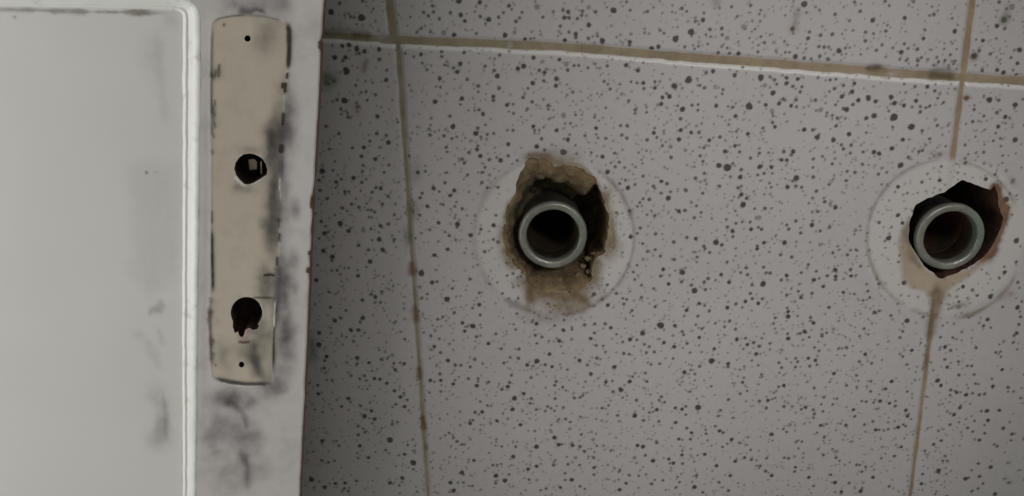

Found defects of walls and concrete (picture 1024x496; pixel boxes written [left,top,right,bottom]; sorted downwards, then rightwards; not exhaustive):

spalling [502,155,615,300]
spalling [909,180,1009,279]